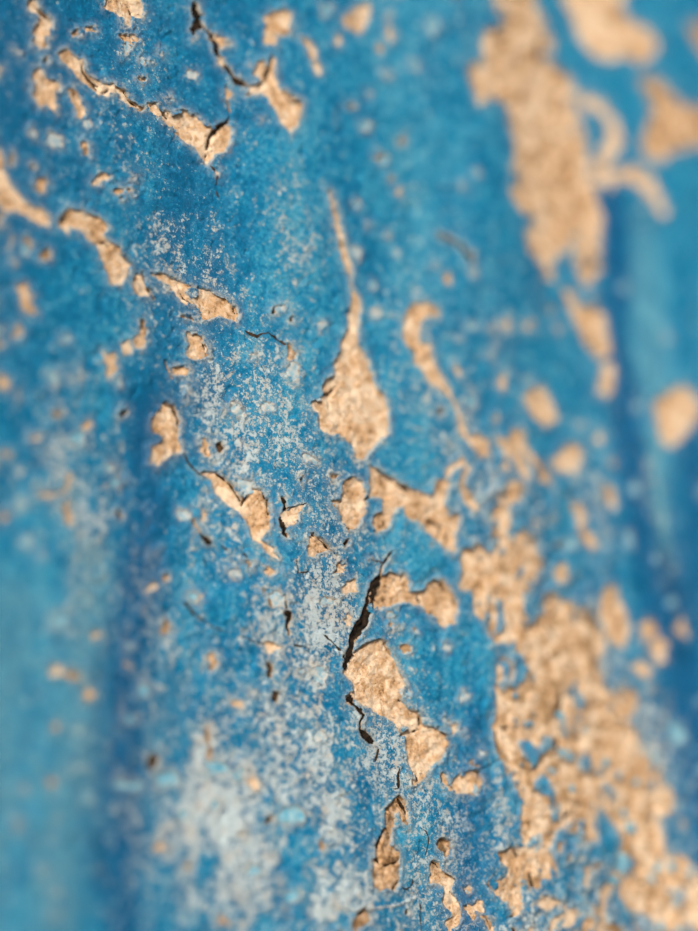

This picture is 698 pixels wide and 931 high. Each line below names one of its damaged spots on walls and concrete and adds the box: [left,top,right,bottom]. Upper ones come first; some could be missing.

peeling [27,0,306,175]
peeling [467,0,669,286]
peeling [638,78,698,162]
peeling [0,154,238,377]
crack [183,601,264,645]
peeling [201,472,303,576]
peeling [303,531,328,559]
crack [284,552,392,670]
peeling [311,191,698,931]
crack [346,694,379,762]
crack [392,768,400,790]
crack [401,879,422,931]